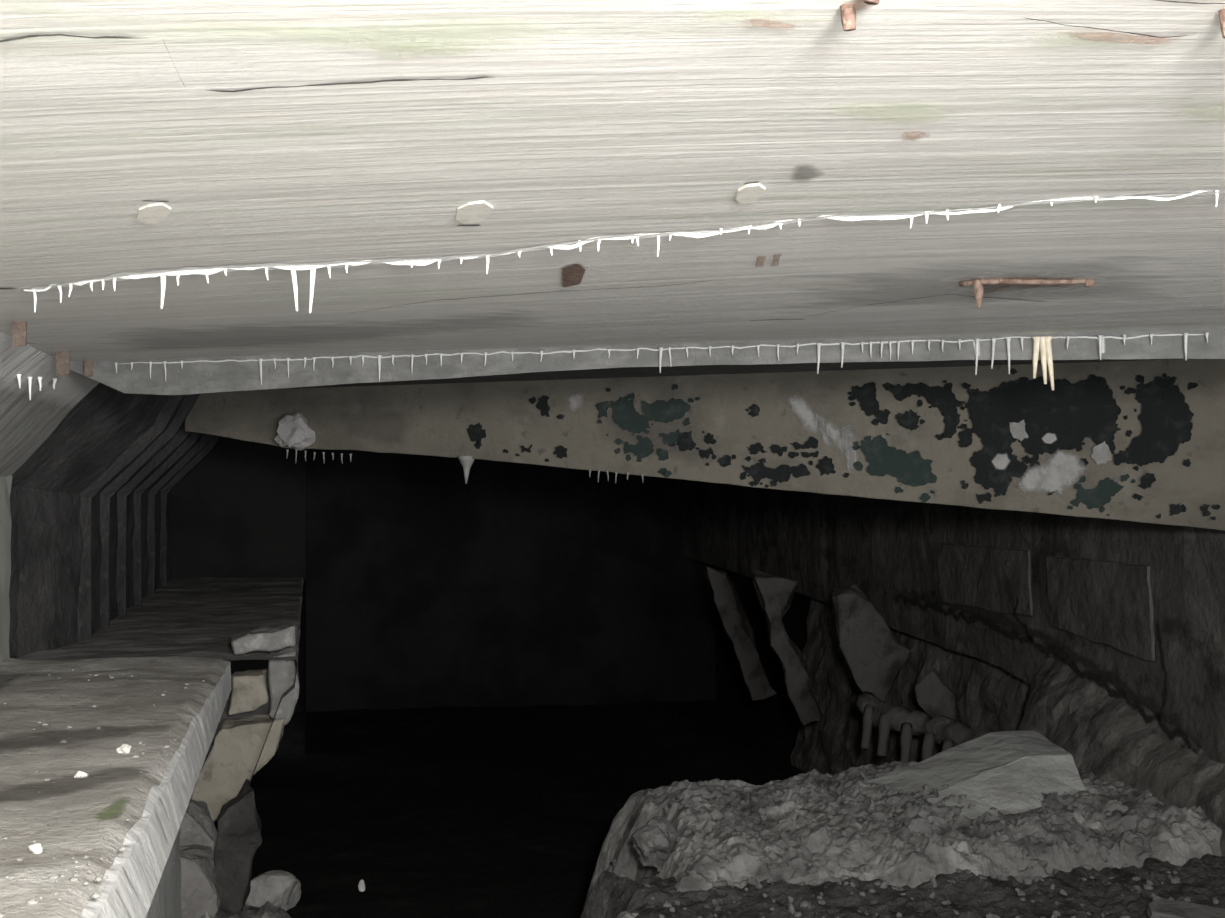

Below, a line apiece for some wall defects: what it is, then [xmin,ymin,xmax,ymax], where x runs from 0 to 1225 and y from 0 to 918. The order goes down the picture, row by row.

rust [852,0,871,11]
efflorescence [21,190,1225,313]
rust [984,279,1061,293]
efflorescence [1053,332,1209,360]
efflorescence [115,337,1031,385]
peeling [595,368,1198,516]
peeling [1156,503,1221,520]